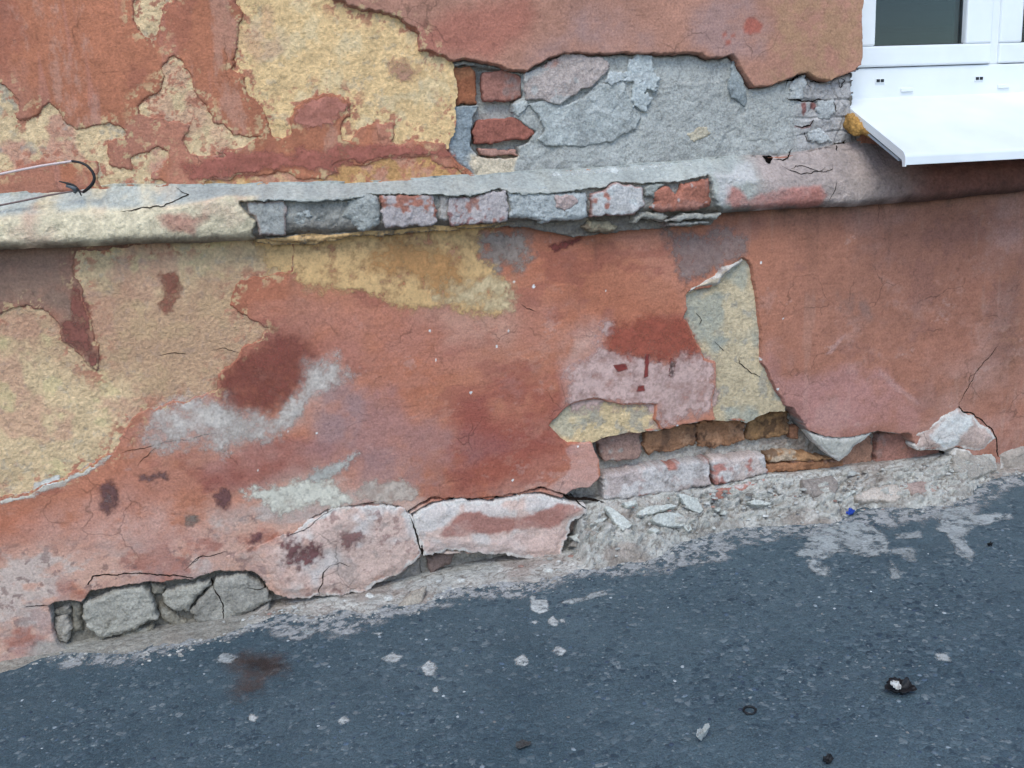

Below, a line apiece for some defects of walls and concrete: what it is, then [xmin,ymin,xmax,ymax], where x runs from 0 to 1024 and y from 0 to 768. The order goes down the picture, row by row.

crack [776,75,845,197]
crack [127,188,189,211]
peeling [0,0,857,498]
damp [143,359,349,453]
flaking render [549,258,1024,515]
crack [959,348,999,457]
spalling [650,512,692,531]
crack [87,551,226,619]
flaking render [53,570,274,643]